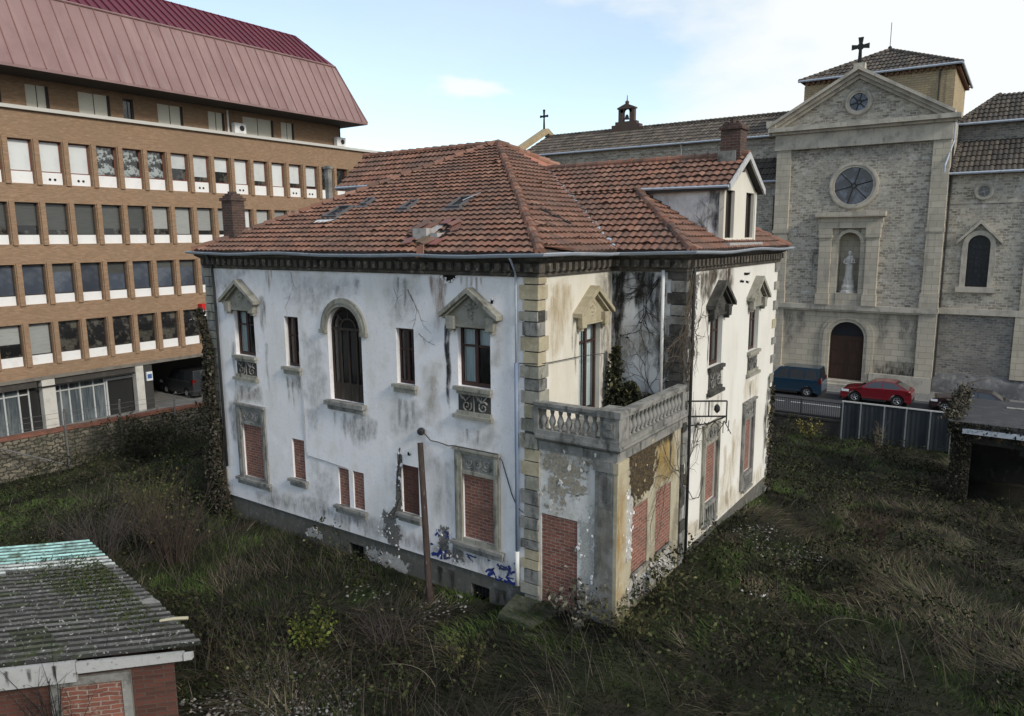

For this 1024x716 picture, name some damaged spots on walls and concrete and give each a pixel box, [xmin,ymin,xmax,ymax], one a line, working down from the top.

peeling [365,451,411,574]
peeling [537,450,596,598]
flaking render [623,439,660,562]